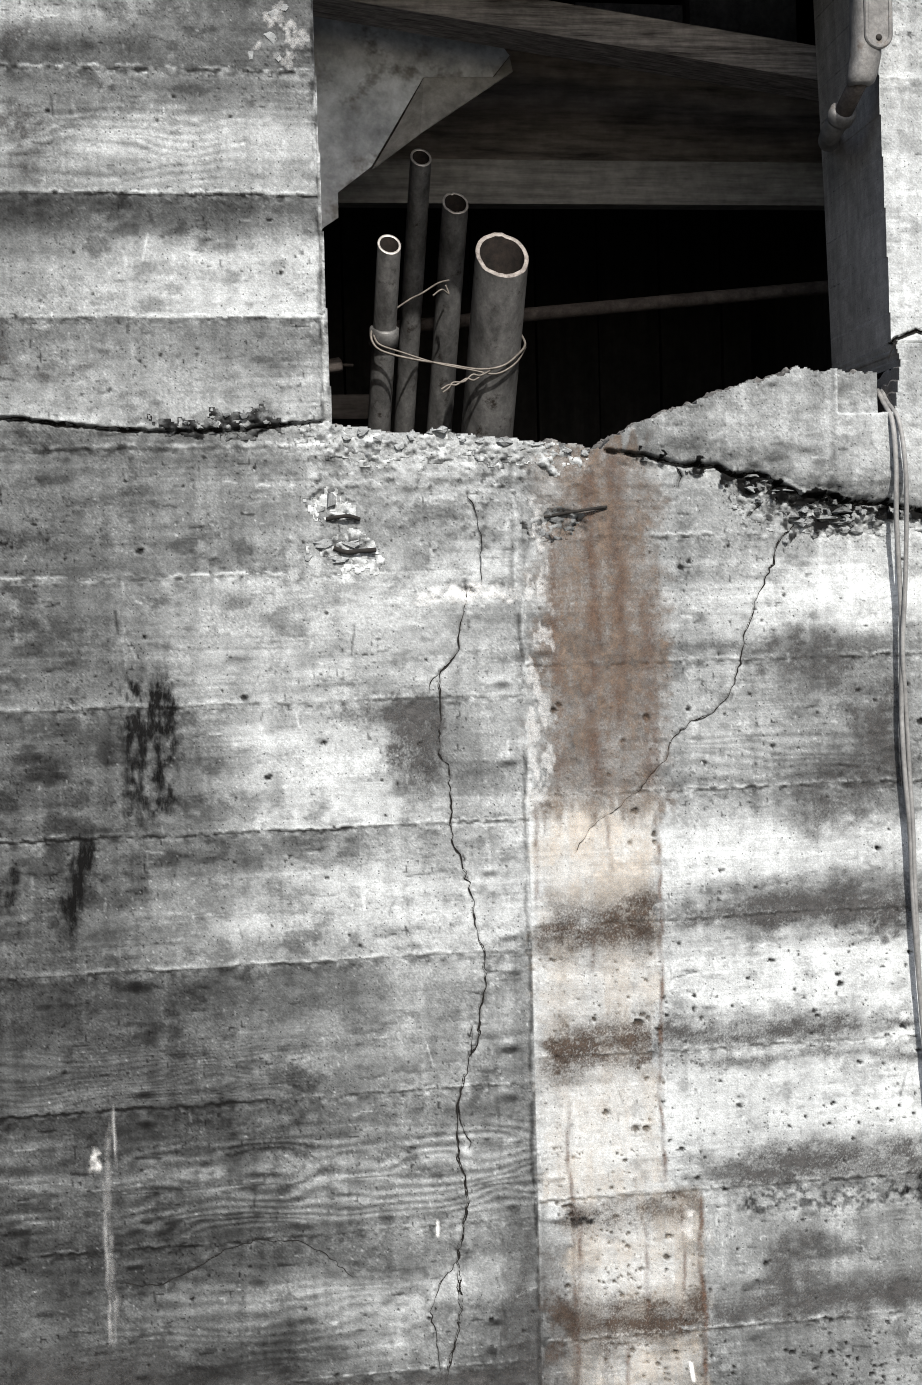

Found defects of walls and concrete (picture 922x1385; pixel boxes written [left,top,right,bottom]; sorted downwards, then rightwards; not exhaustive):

crack [5,417,321,434]
spalling [303,486,385,576]
spalling [147,404,590,477]
spalling [520,505,607,543]
spalling [638,445,668,467]
spalling [685,455,922,546]
corrosion [534,432,670,903]
crack [577,452,916,850]
water stain [123,679,179,818]
crack [429,496,487,1385]